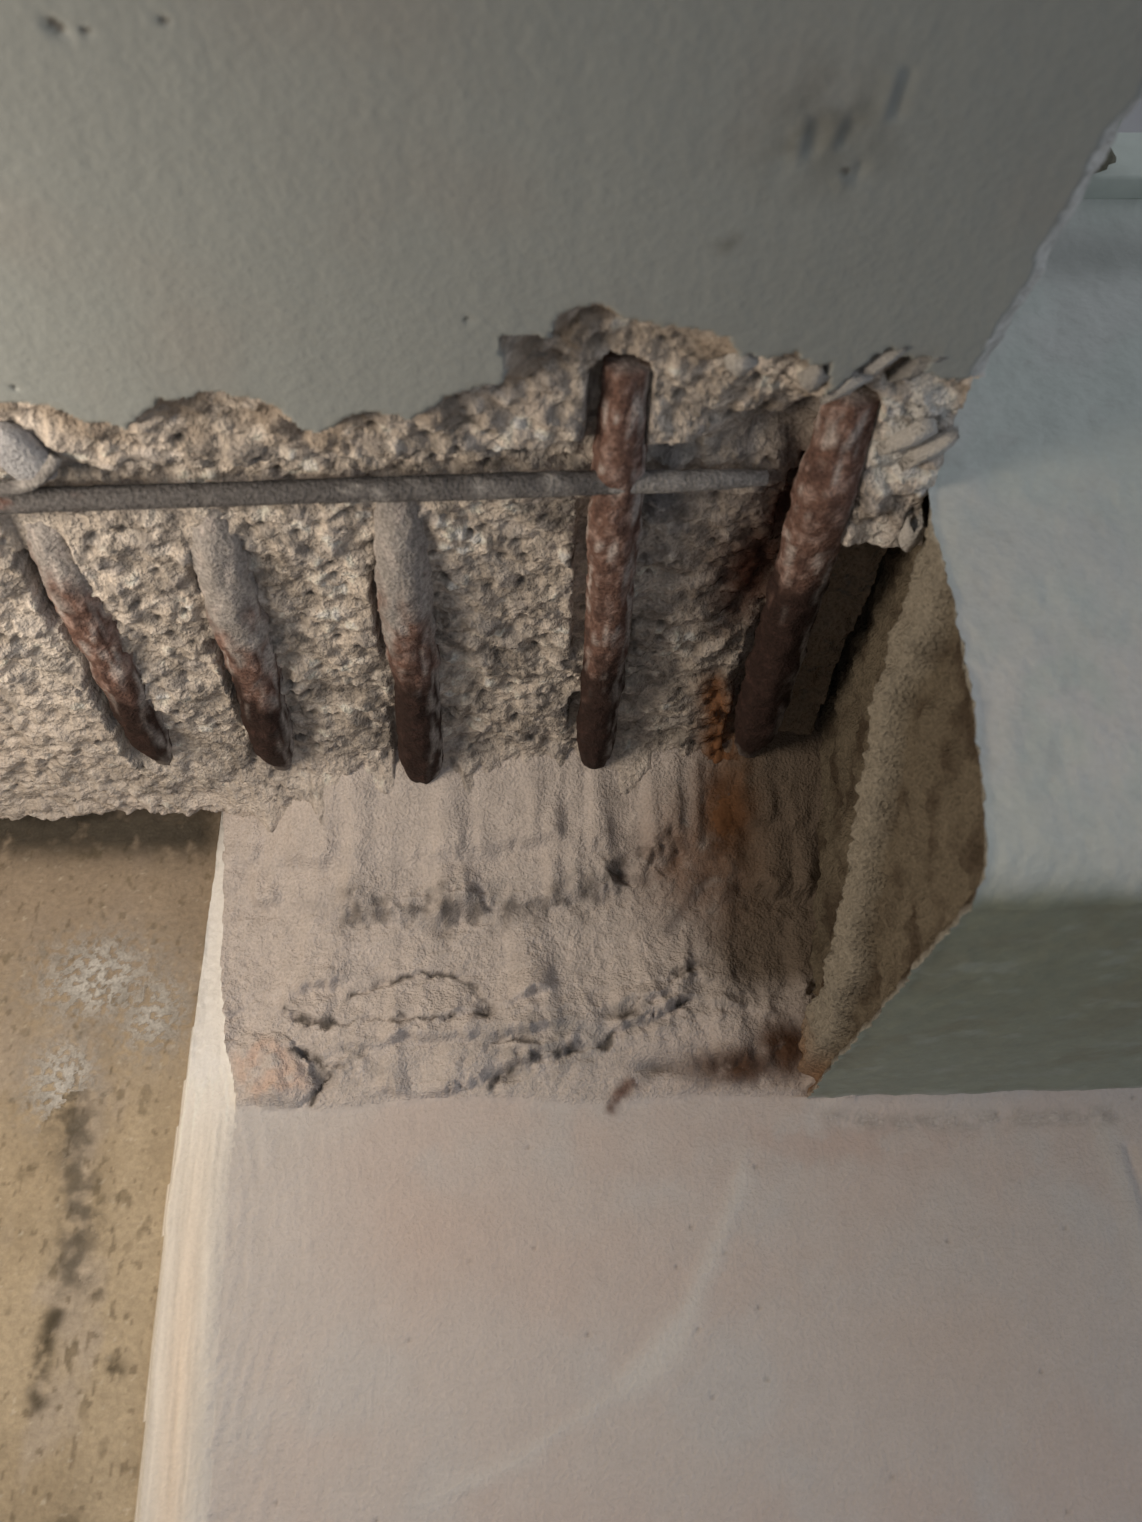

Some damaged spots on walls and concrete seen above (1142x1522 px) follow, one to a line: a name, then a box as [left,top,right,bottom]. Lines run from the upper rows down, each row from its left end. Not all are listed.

rust [726,471,798,604]
spalling [0,96,1142,1110]
efflorescence [49,942,178,1042]
efflorescence [34,1046,90,1113]
crack [284,995,352,1106]
rust [609,1080,635,1110]
rust [699,1026,803,1081]
water stain [63,1164,89,1282]
water stain [42,1310,61,1353]